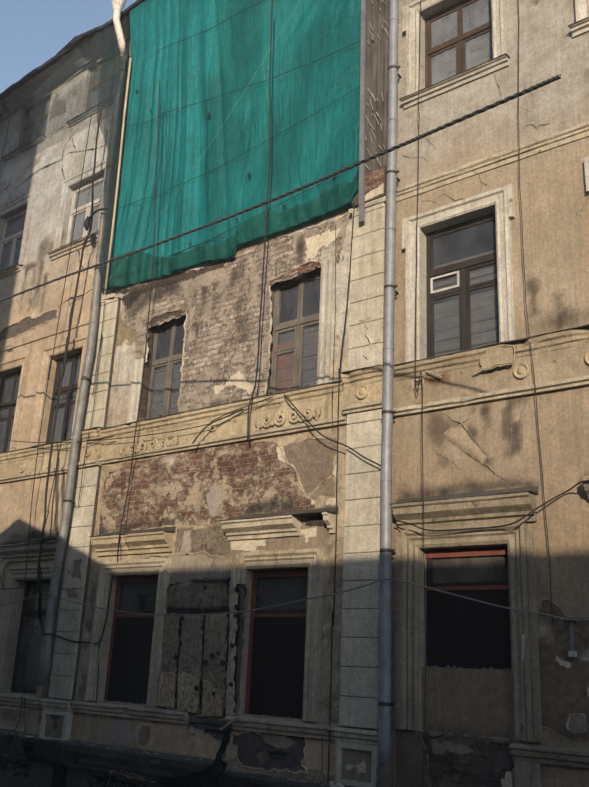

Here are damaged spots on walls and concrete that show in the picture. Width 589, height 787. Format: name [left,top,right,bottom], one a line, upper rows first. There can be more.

crack [0,123,107,201]
flaking render [100,211,352,412]
crack [433,410,507,482]
flaking render [97,435,341,775]
flaking render [418,731,515,787]